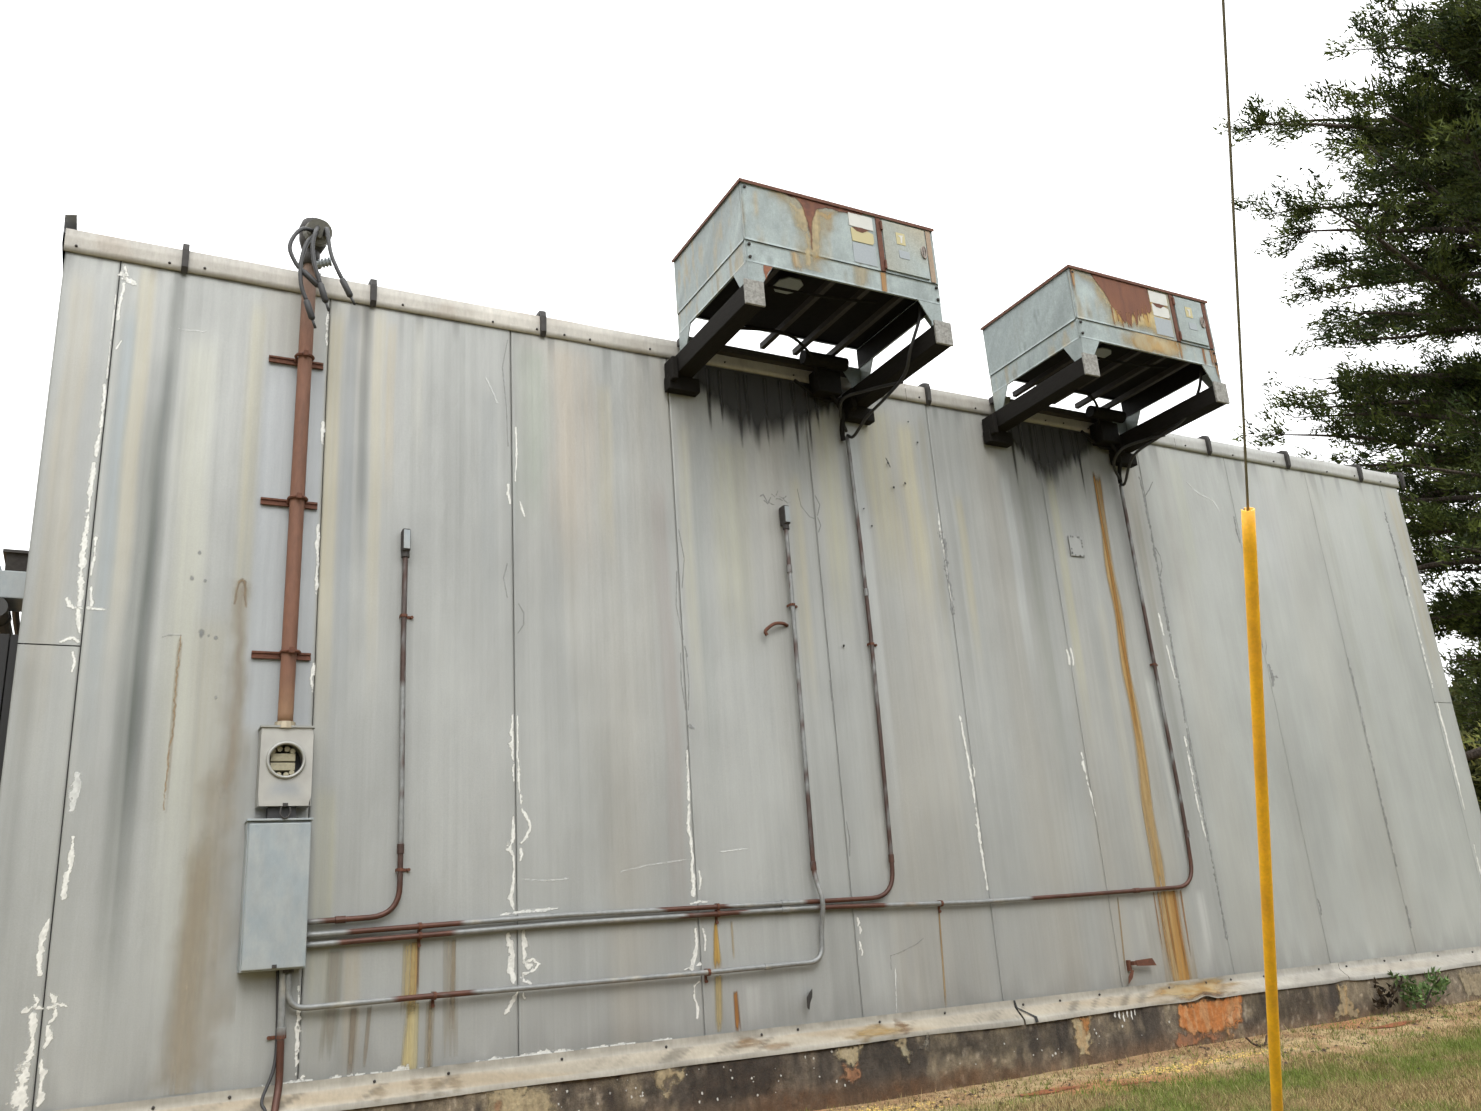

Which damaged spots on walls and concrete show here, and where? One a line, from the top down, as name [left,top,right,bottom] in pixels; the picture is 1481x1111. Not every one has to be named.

rust [786,193,888,292]
rust [1070,268,1183,357]
rust [1093,475,1242,1048]
rust [402,940,456,1070]